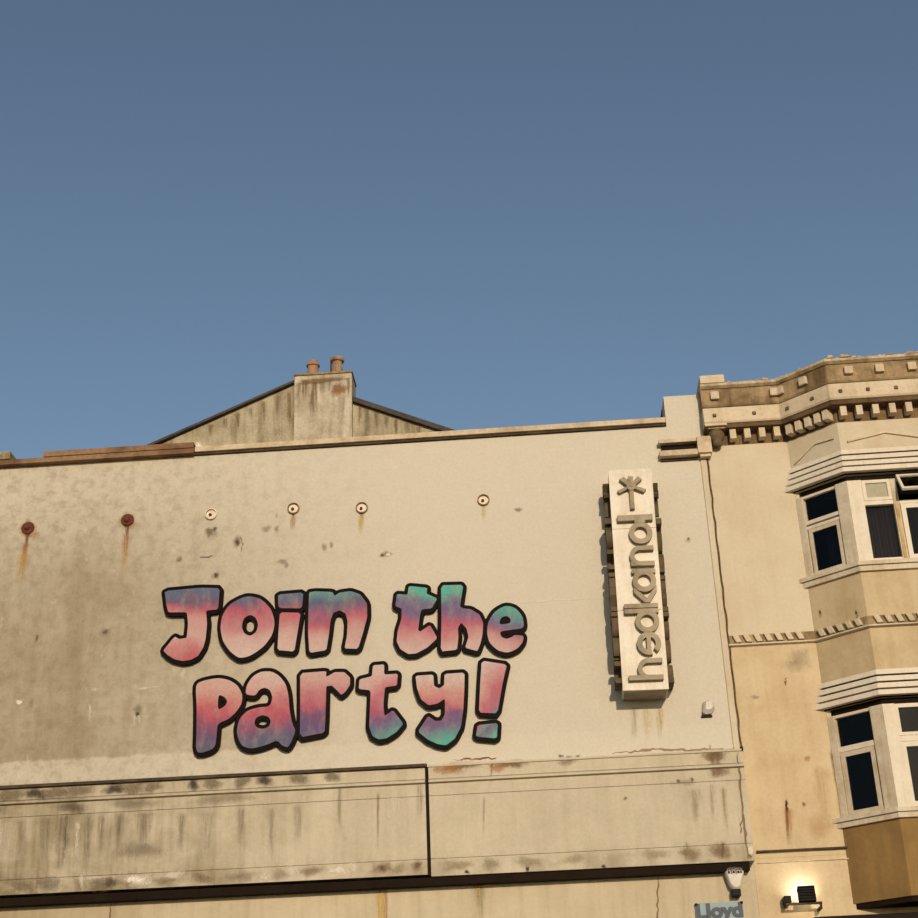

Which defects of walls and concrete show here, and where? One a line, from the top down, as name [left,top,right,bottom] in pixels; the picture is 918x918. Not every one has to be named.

water stain [277,378,349,417]
water stain [706,752,722,774]